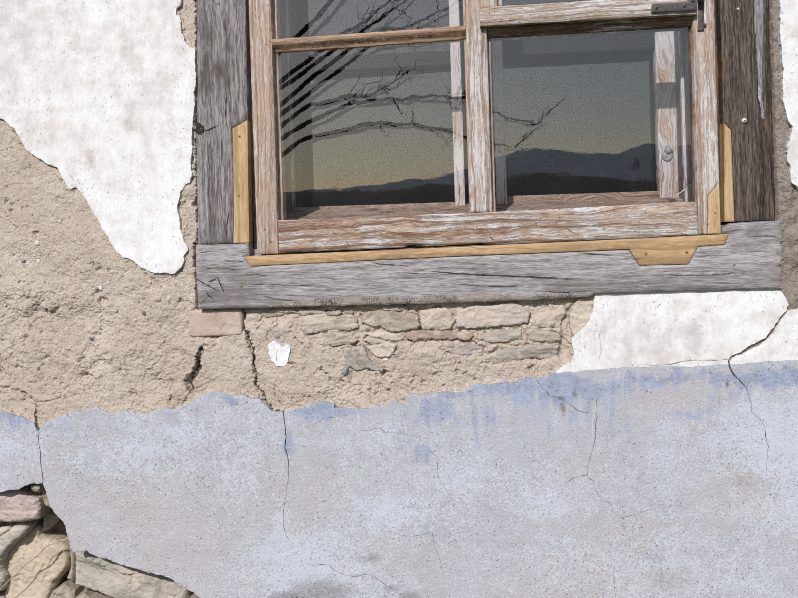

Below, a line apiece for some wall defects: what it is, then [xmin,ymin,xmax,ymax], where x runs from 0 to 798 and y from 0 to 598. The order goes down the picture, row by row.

spalling [177,0,197,50]
spalling [769,0,798,309]
spalling [0,60,594,430]
crack [190,348,204,388]
crack [243,328,266,396]
crack [646,306,791,469]
crack [359,417,473,508]
crack [539,383,650,530]
spalling [0,483,200,598]